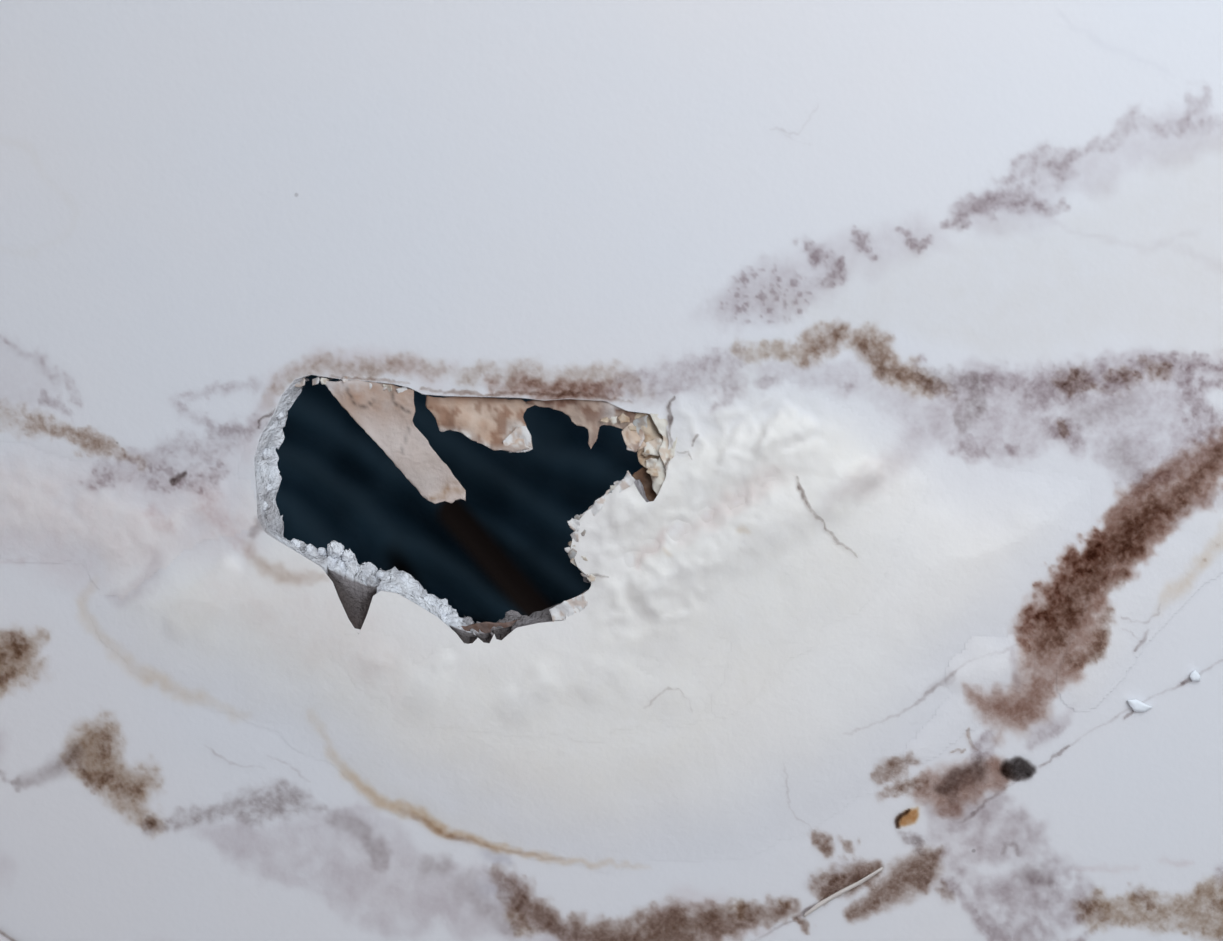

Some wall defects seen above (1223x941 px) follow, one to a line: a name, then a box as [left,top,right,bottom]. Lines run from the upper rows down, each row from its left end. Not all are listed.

spalling [254,375,677,644]
leakage [1025,450,1220,673]
leakage [991,757,1035,780]
leakage [512,893,804,941]
leakage [822,853,939,918]